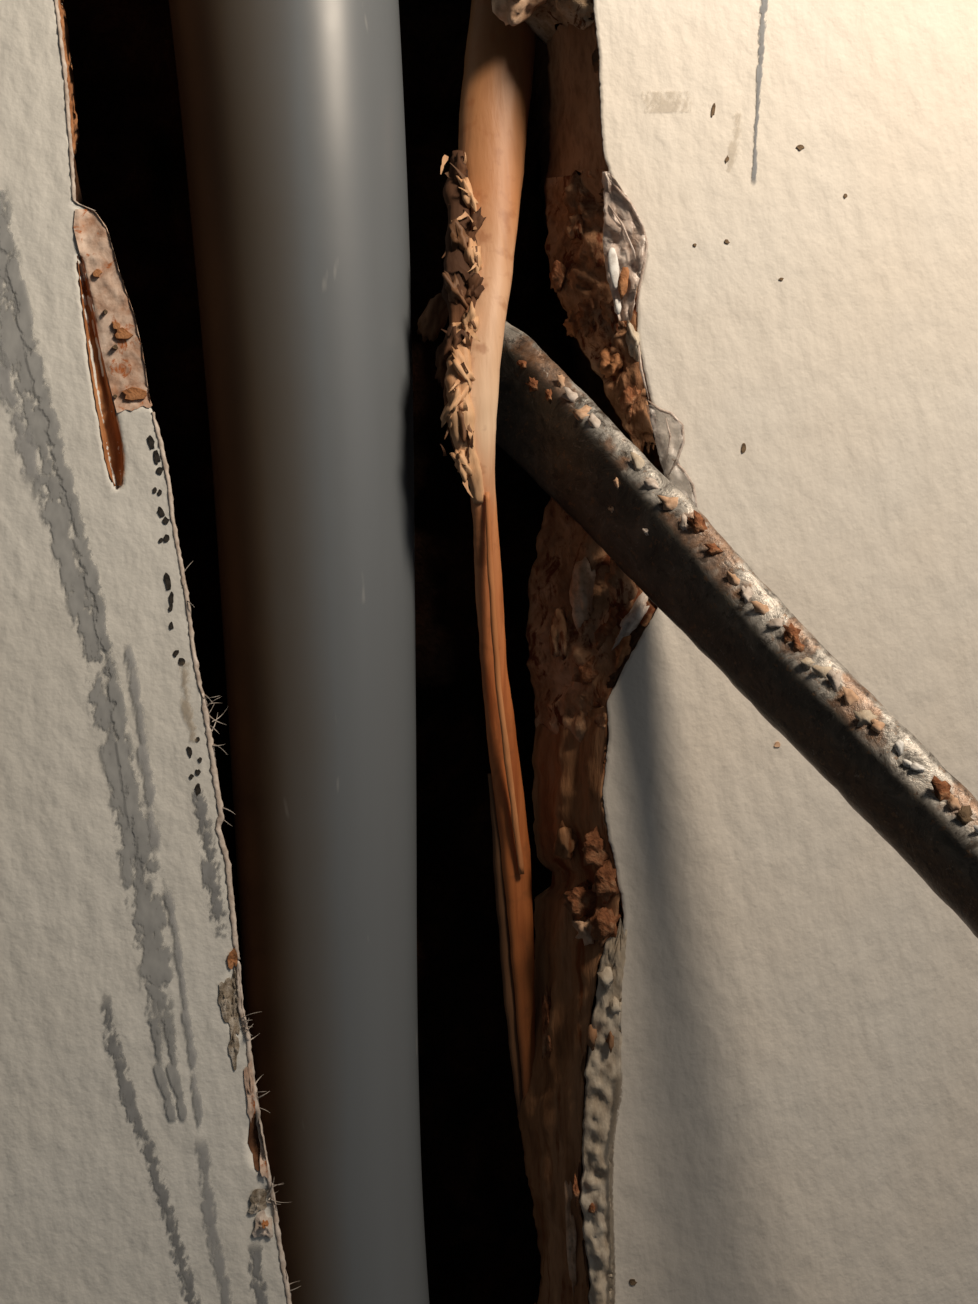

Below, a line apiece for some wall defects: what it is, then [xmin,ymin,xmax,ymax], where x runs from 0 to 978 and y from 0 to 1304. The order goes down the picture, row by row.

flaking render [58,0,79,154]
flaking render [73,209,152,486]
peeling [440,152,486,482]
flaking render [492,0,698,509]
damp [0,190,203,1125]
damp [193,792,227,936]
flaking render [518,497,657,1304]
damp [102,1000,201,1304]
damp [196,1144,232,1304]
flaking render [218,948,273,1239]
damp [249,1247,268,1304]